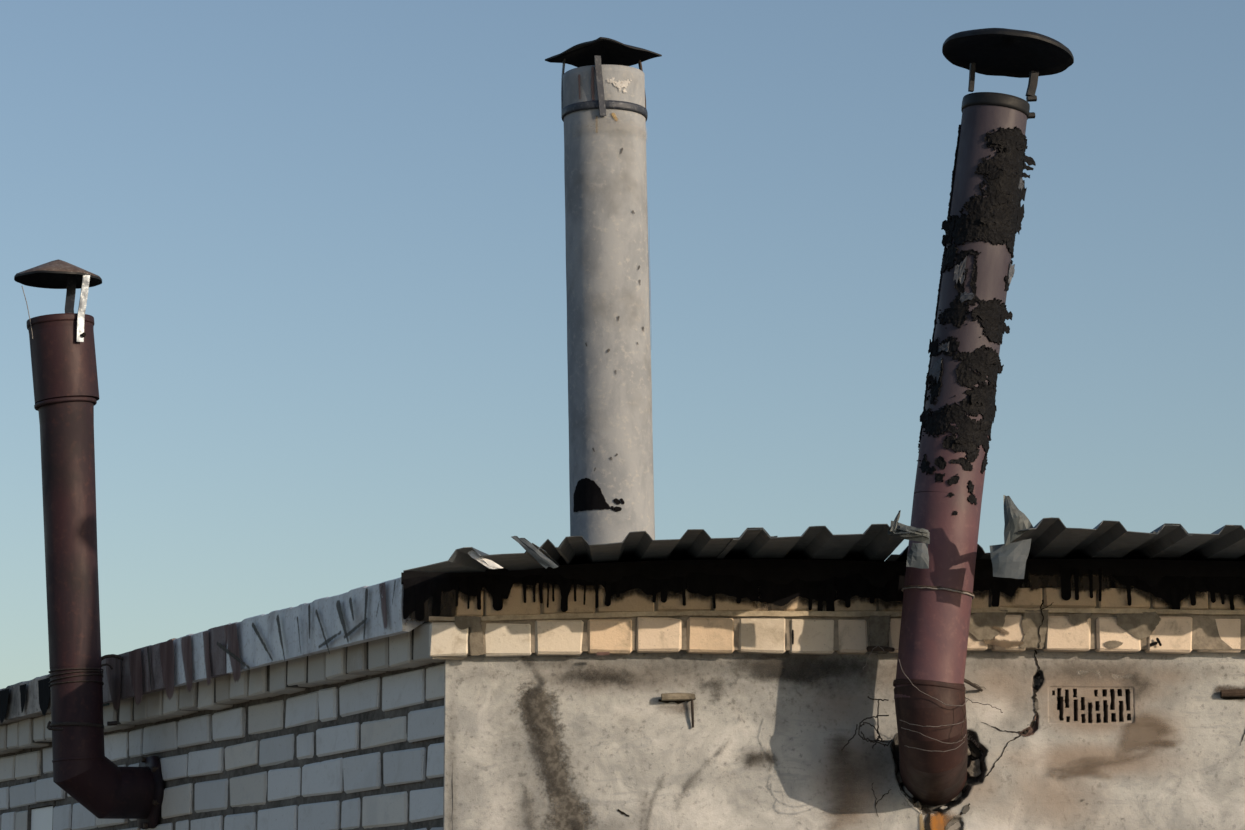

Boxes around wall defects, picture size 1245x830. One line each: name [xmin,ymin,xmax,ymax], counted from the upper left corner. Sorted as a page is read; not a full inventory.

water stain [252,615,285,661]
water stain [297,580,396,654]
crack [982,600,1054,777]
crack [924,809,932,830]
rust [920,813,954,830]